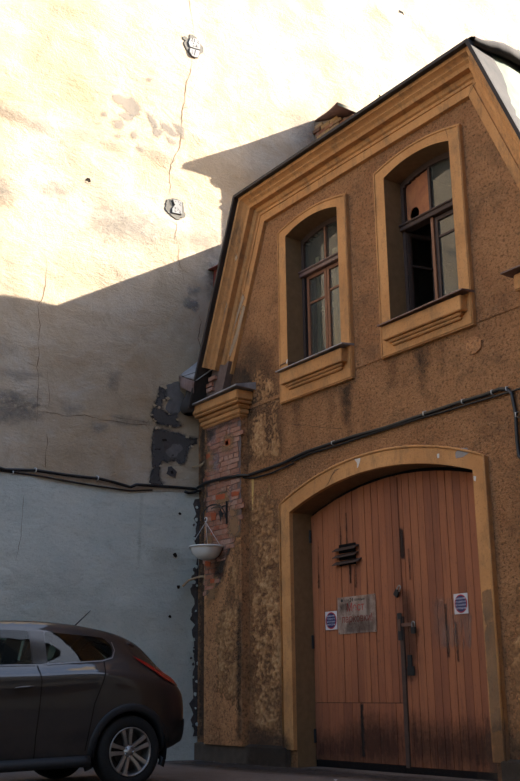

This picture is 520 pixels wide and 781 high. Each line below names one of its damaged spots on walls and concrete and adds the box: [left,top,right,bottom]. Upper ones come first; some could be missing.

crack [29,260,150,467]
peeling [148,370,282,736]
damp [399,528,411,578]